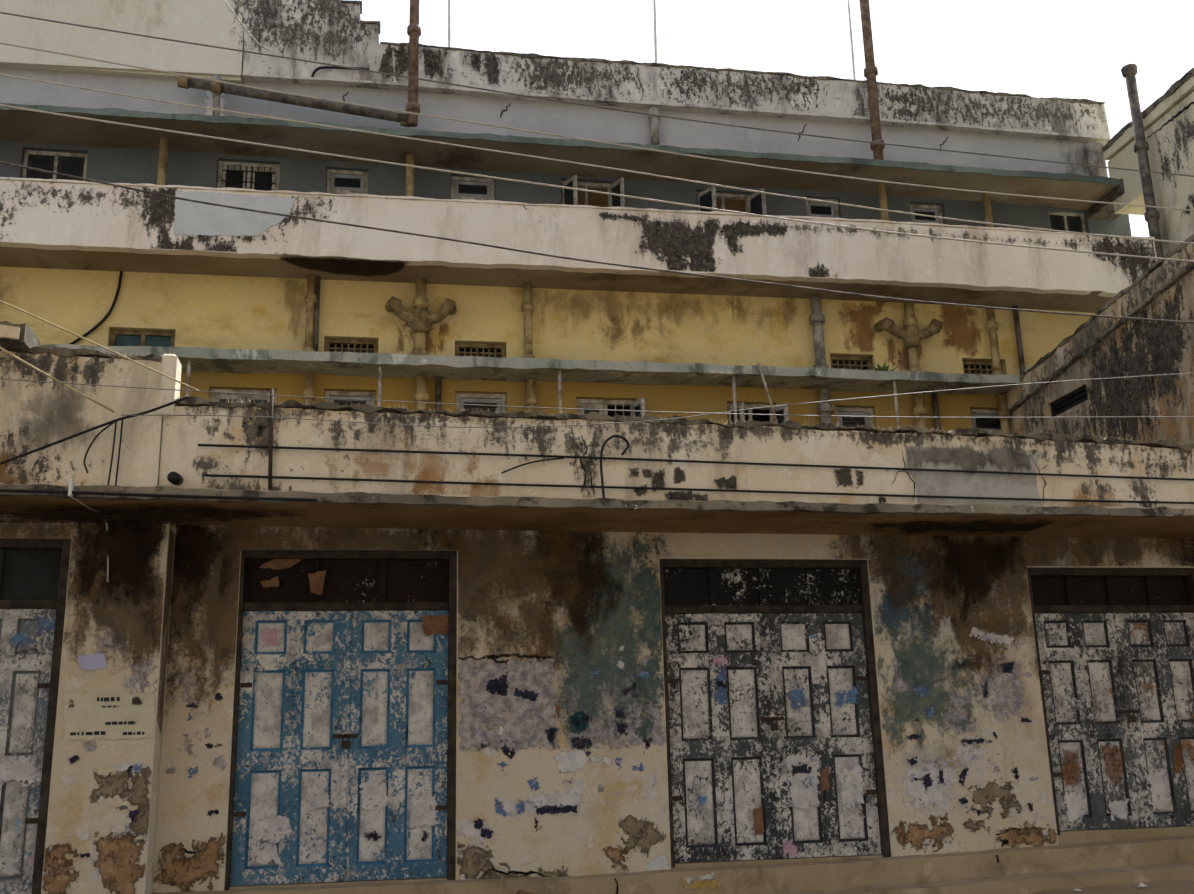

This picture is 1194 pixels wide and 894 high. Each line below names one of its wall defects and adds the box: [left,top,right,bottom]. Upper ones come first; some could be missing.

water stain [233,0,378,63]
water stain [0,44,1109,171]
water stain [1155,103,1194,186]
water stain [0,181,266,252]
water stain [599,212,1047,272]
water stain [186,234,1194,508]
water stain [0,505,664,733]
water stain [832,519,1194,679]
spalling [41,841,79,894]
spalling [90,766,226,894]
spalling [602,815,666,873]
spalling [891,767,1057,852]